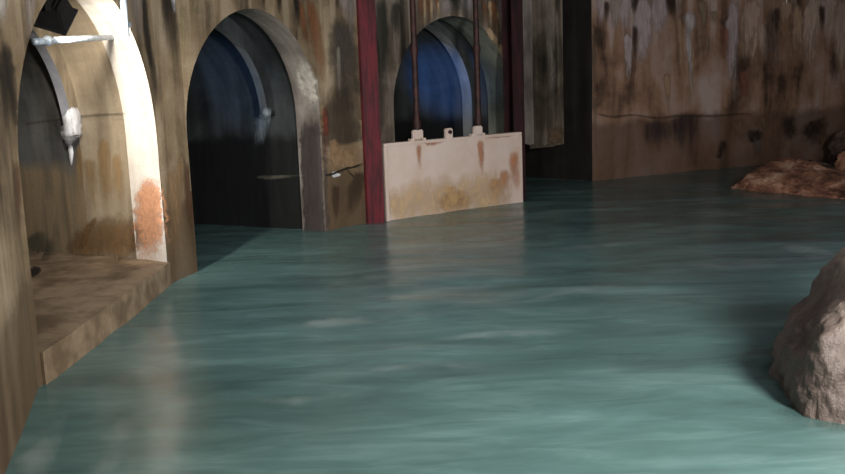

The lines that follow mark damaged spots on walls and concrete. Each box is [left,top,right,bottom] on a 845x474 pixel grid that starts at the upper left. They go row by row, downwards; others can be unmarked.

water stain [596,0,674,70]
water stain [685,1,717,69]
water stain [726,0,845,78]
water stain [29,234,51,256]
water stain [73,220,139,257]